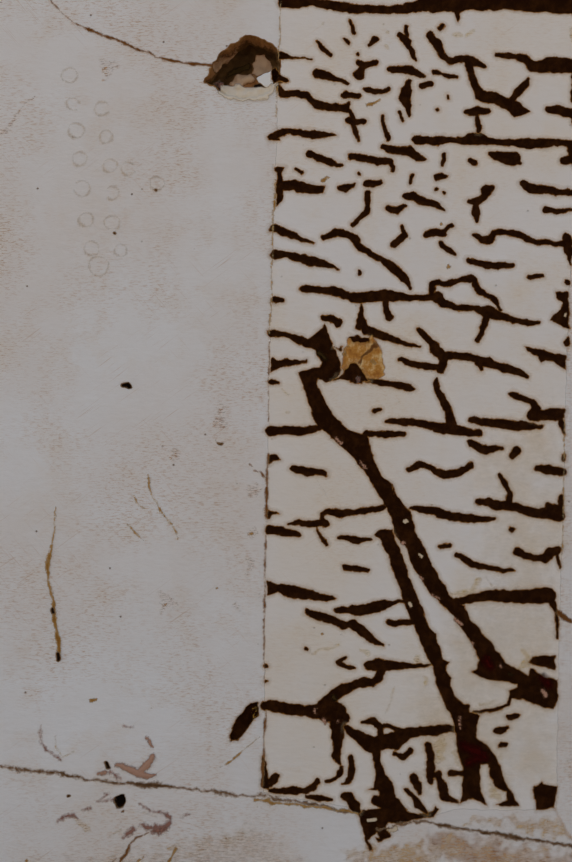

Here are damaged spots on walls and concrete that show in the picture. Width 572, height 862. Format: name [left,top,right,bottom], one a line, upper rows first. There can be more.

crack [51,1,213,67]
peeling [203,0,572,851]
crack [249,453,269,518]
crack [261,539,269,668]
crack [0,713,358,814]
crack [376,820,572,848]